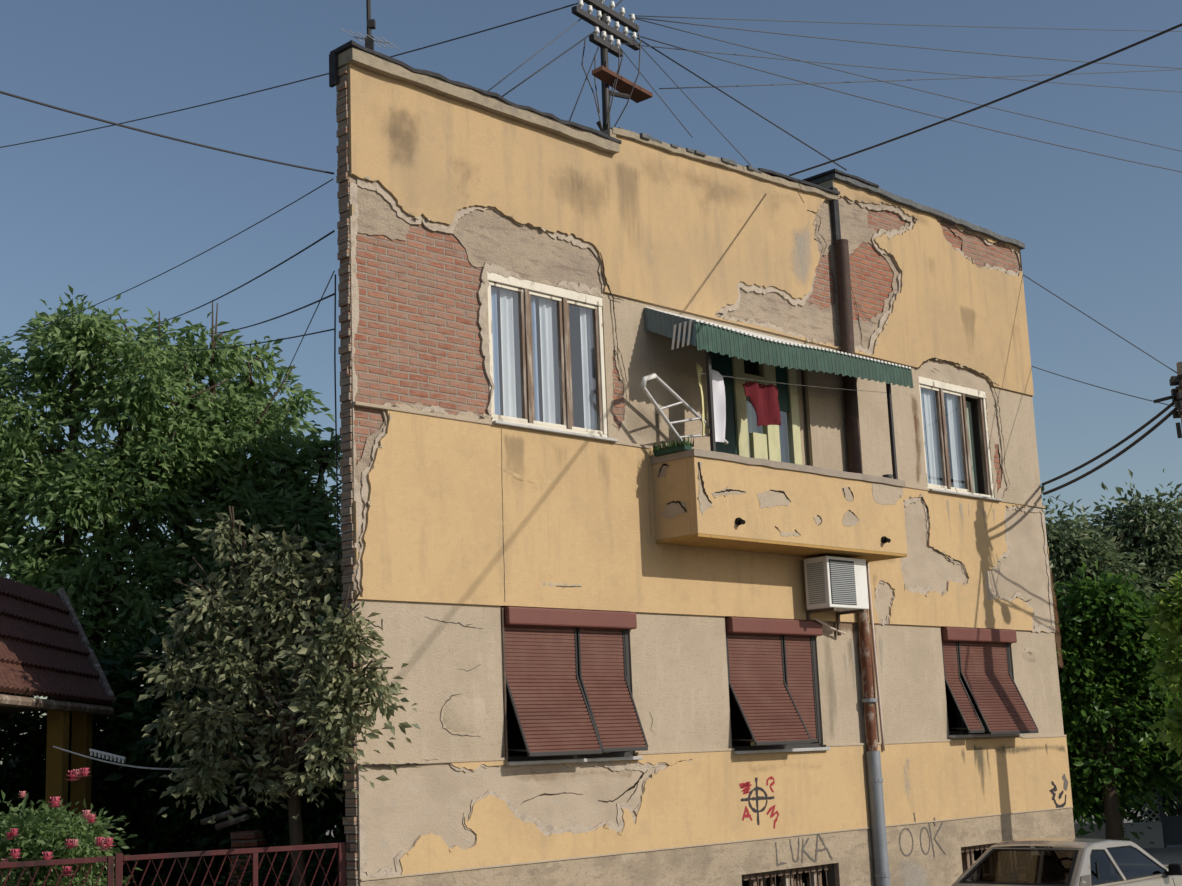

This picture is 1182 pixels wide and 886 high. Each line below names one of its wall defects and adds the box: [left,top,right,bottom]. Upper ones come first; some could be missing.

flaking render [715,196,918,355]
flaking render [936,218,1021,276]
flaking render [346,175,605,597]
flaking render [661,461,790,519]
flaking render [842,487,860,527]
flaking render [872,482,969,625]
flaking render [916,359,1056,633]
crack [424,616,483,629]
crack [440,664,481,737]
corrosion [852,610,878,751]
peeling [357,758,692,882]